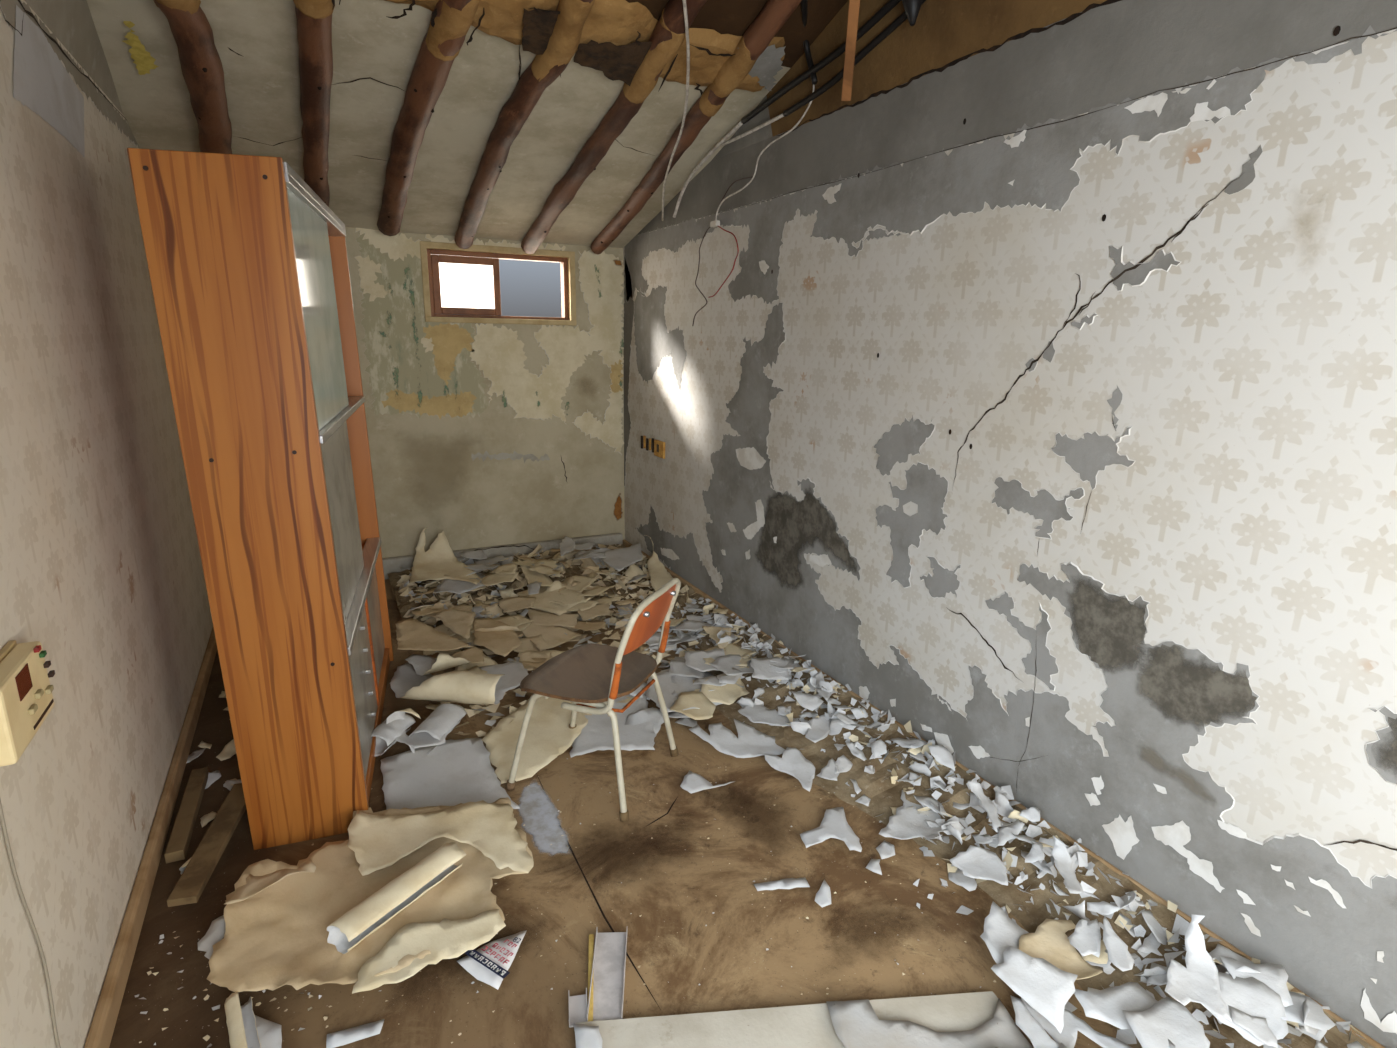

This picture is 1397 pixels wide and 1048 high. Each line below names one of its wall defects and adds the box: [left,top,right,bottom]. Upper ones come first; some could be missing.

peeling [1125,79,1231,122]
peeling [354,228,624,456]
crack [952,144,1263,490]
water stain [756,491,857,588]
water stain [1070,580,1257,726]
peeling [921,724,990,759]
water stain [1379,717,1397,770]
peeling [1085,776,1104,806]
crack [1328,839,1397,851]
peeling [1102,814,1261,937]
peeling [1271,865,1347,917]
peeling [1360,978,1397,1034]